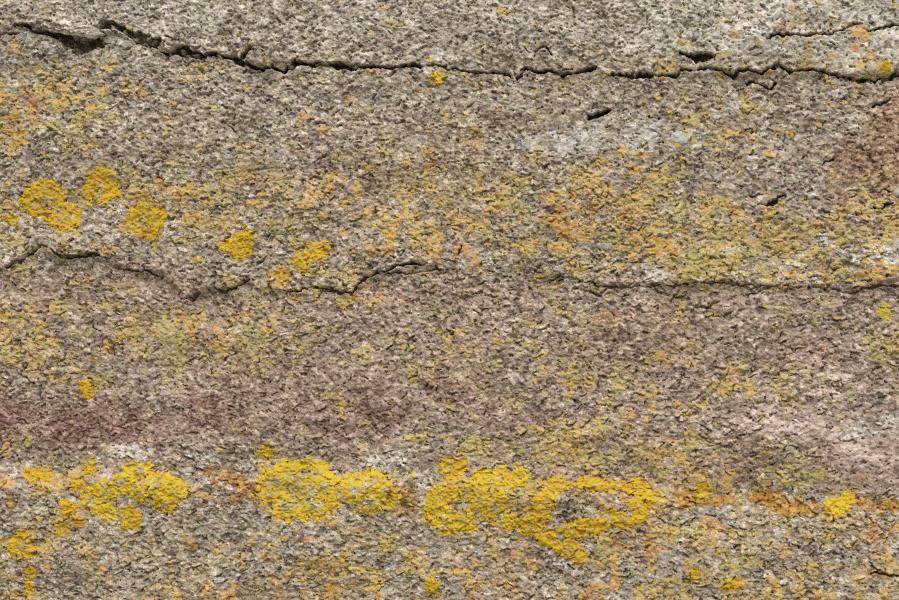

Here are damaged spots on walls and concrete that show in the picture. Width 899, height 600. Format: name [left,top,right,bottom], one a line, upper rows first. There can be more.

crack [0,21,135,48]
crack [769,23,899,40]
crack [157,46,899,108]
crack [6,245,154,275]
crack [186,259,265,301]
crack [287,250,460,295]
crack [526,269,899,317]